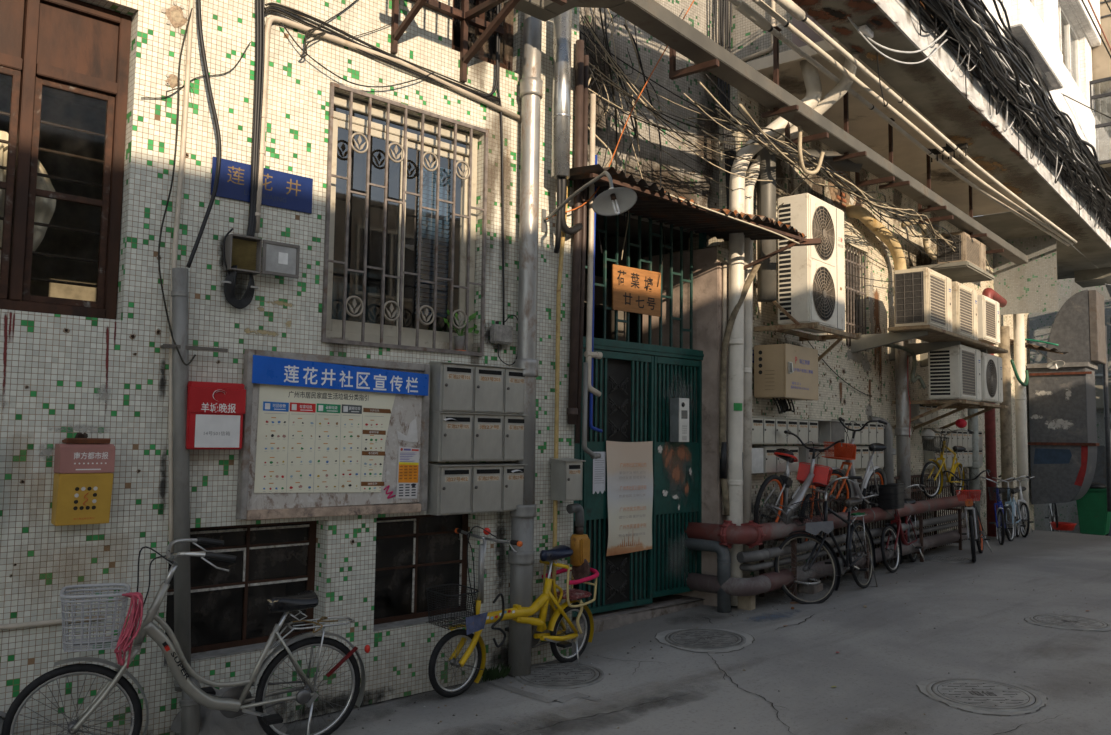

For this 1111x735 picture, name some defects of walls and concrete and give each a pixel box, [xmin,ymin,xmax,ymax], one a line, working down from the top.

rust [3,312,15,407]
rust [105,321,116,406]
peeling [1031,414,1073,430]
water stain [281,690,384,719]
crack [599,617,795,735]